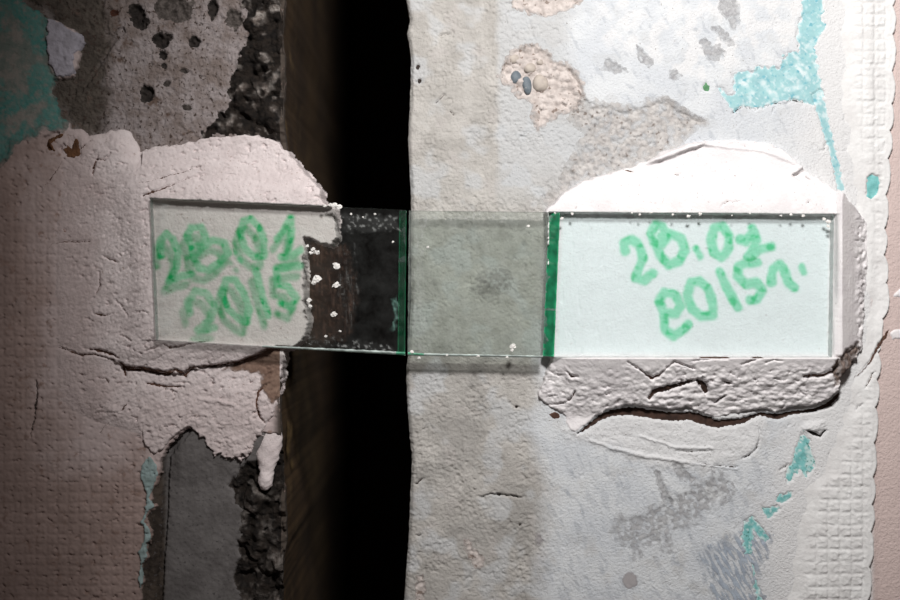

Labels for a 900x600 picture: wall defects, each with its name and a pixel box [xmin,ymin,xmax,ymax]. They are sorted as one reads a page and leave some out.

spalling [0,0,284,163]
spalling [496,43,706,206]
peeling [703,0,844,191]
crack [59,341,252,392]
crack [635,356,779,403]
crack [803,370,831,378]
spalling [138,427,285,600]
peeling [741,430,816,600]